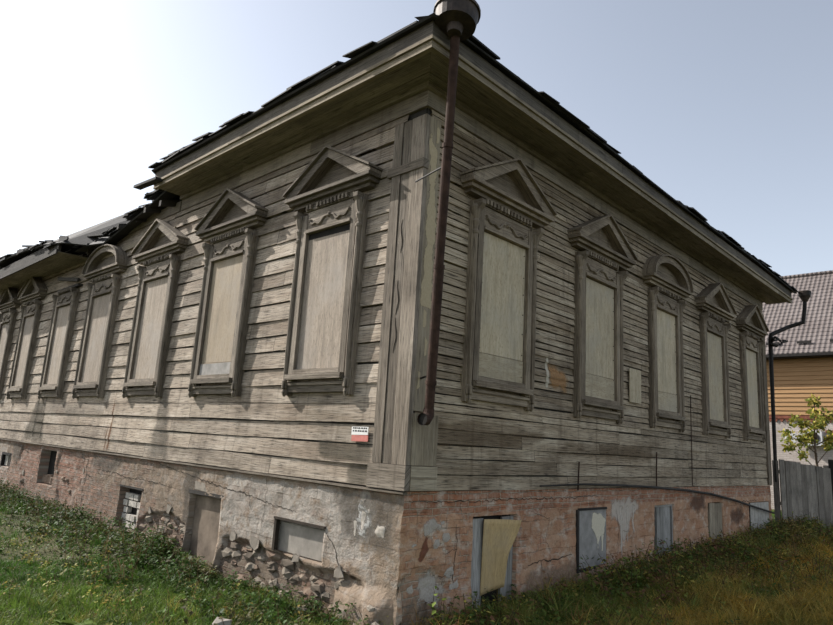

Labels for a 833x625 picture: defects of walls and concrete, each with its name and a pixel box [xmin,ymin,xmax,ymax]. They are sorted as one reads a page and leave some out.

crack [79,454,296,527]
spalling [211,530,355,619]
peeling [354,505,385,538]
spalling [397,518,458,625]
crack [411,495,598,590]